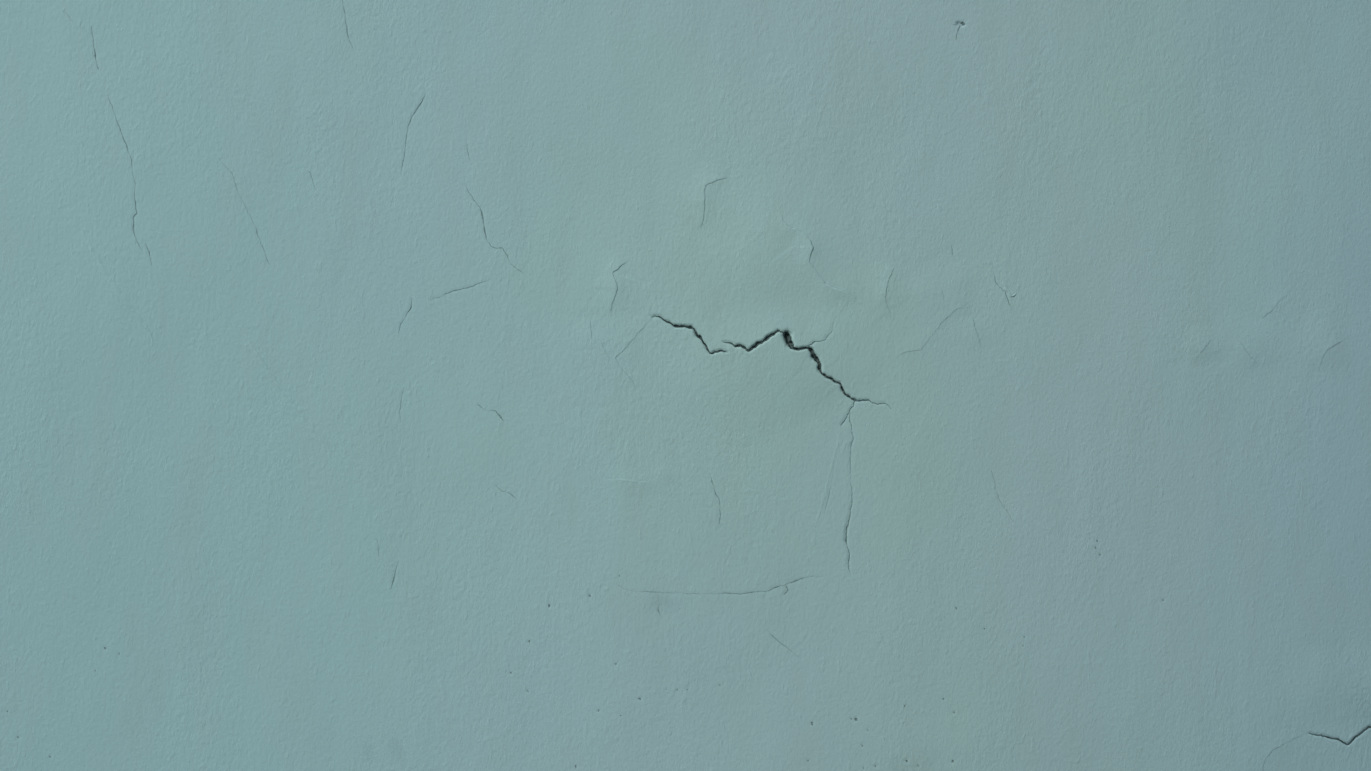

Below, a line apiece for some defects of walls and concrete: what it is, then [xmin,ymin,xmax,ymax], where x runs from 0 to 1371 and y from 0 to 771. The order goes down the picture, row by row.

crack [653,316,889,571]
crack [1310,726,1371,745]